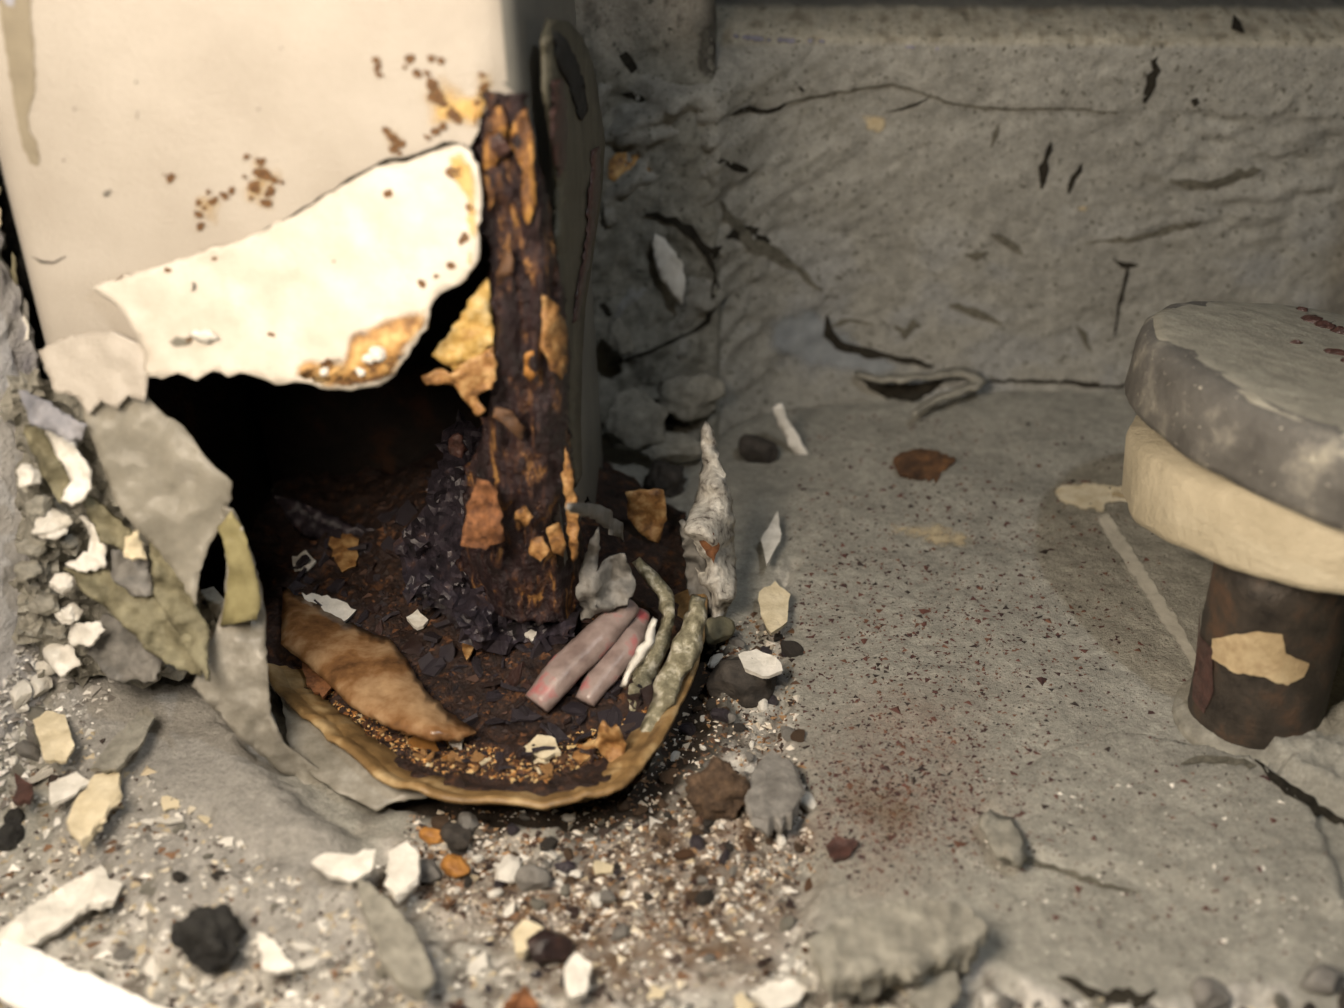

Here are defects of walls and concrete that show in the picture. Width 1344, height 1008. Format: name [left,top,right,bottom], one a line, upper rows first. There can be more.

rust [371,57,383,77]
flaking render [619,51,638,73]
crack [731,82,1118,116]
rust [382,127,405,156]
rust [194,154,284,231]
peeling [90,144,483,390]
crack [610,212,723,365]
peeling [652,234,686,305]
rust [402,54,585,627]
crack [987,378,1125,388]
peeling [12,706,155,808]
crack [1181,755,1344,825]